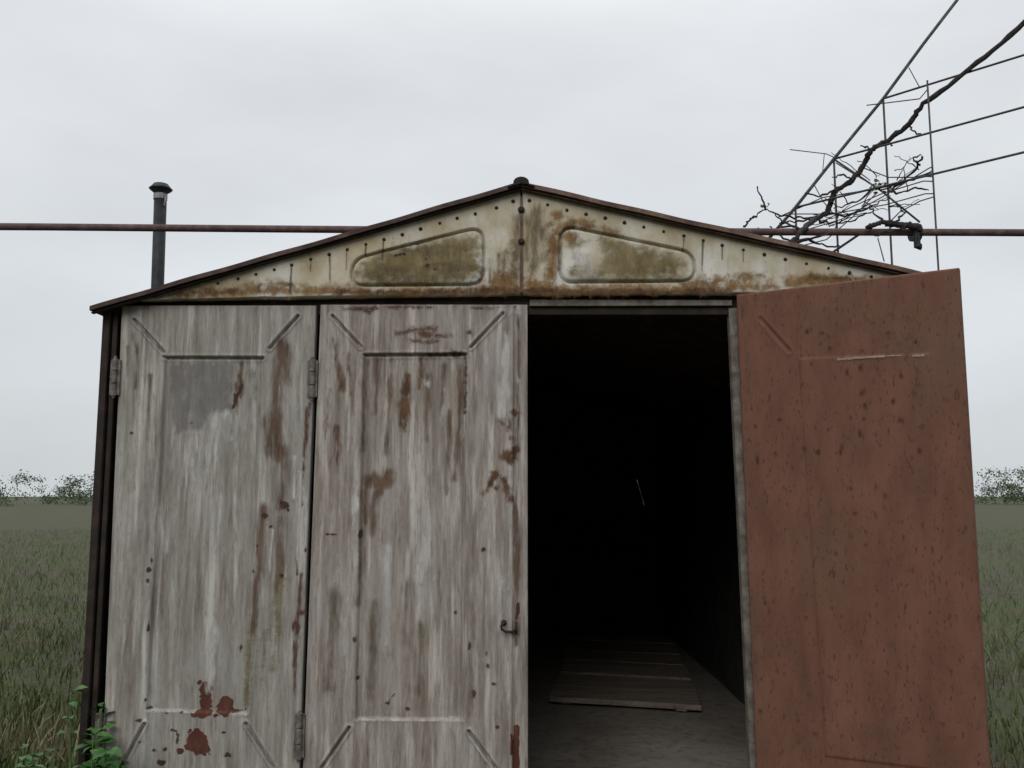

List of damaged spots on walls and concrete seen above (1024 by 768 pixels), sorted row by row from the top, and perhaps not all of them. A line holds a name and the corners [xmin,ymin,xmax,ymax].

leakage [361,236,518,285]
corrosion [155,211,865,314]
leakage [599,237,685,280]
corrosion [302,403,311,476]
corrosion [365,326,467,461]
corrosion [498,394,519,465]
corrosion [251,339,306,691]
corrosion [364,469,393,529]
corrosion [482,471,520,595]
peeling [135,623,247,766]